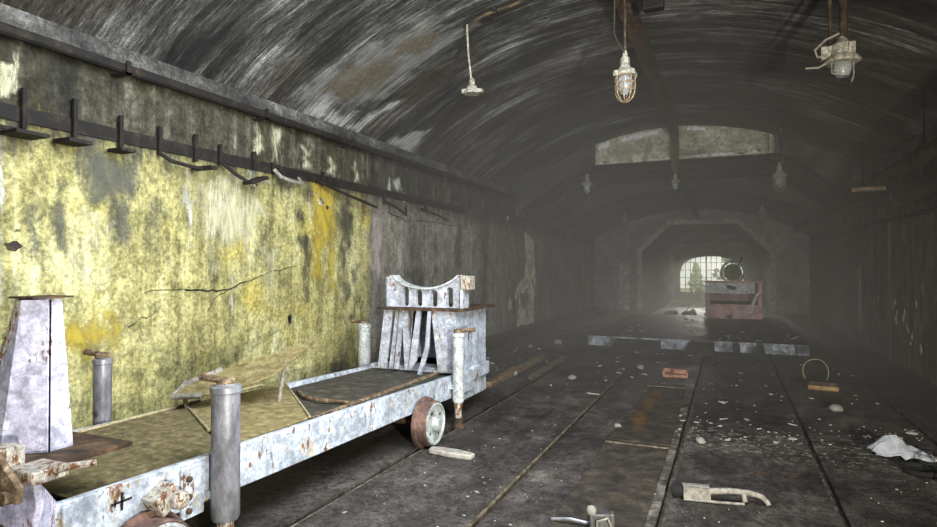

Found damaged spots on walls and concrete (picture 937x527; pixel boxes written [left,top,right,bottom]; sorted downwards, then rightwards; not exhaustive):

damp [52,187,99,290]
damp [75,136,140,248]
crack [128,266,295,328]
damp [206,182,260,241]
damp [299,234,310,300]
damp [336,205,360,318]
damp [372,214,382,284]